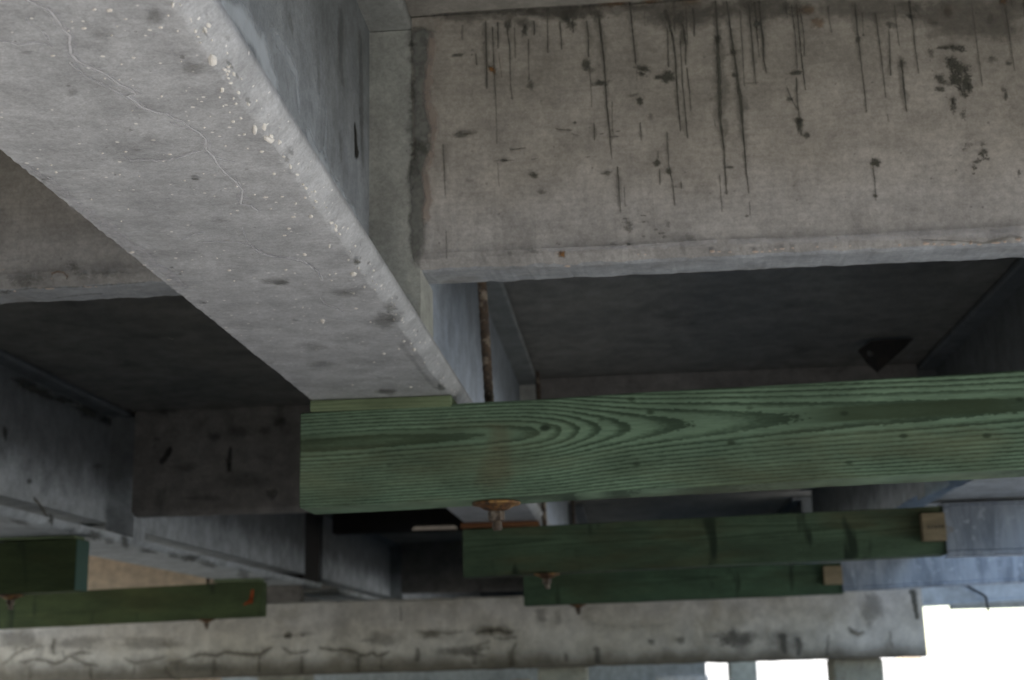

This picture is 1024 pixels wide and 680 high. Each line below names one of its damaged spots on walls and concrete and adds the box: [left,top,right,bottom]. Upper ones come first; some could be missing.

crack [2,0,259,212]
damp [409,29,445,260]
damp [445,5,627,219]
damp [629,0,767,217]
damp [785,4,810,138]
damp [935,8,983,118]